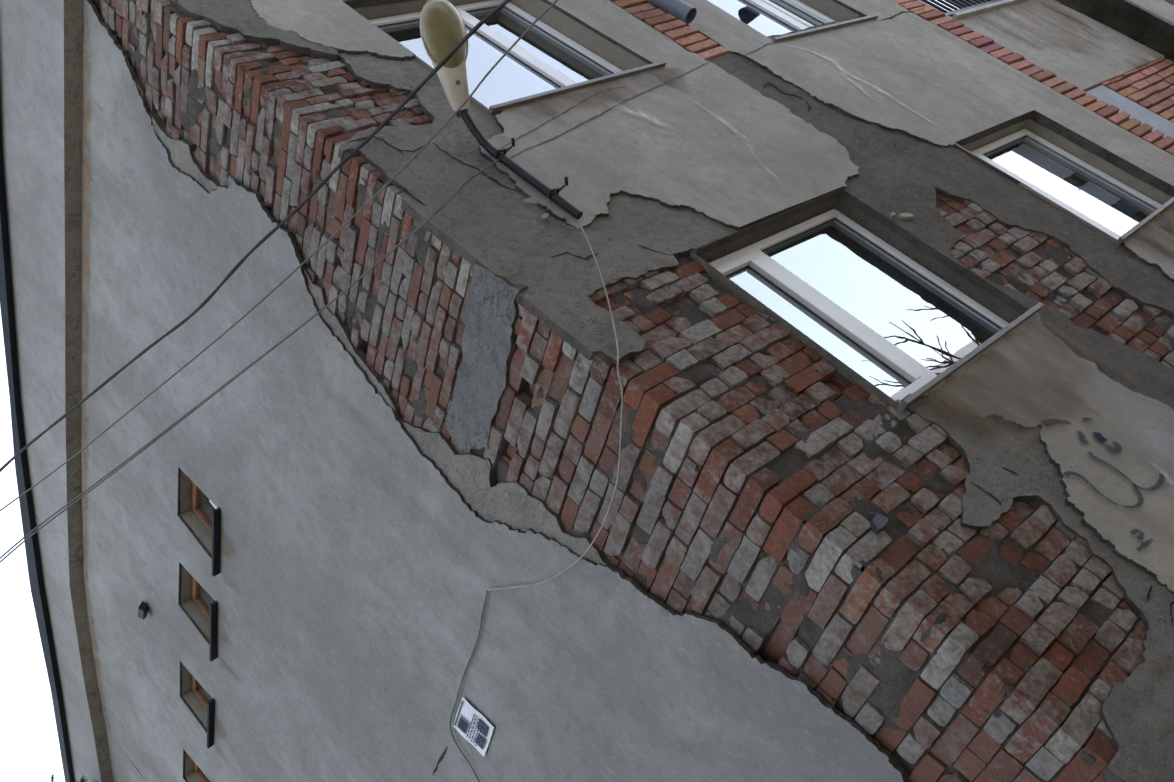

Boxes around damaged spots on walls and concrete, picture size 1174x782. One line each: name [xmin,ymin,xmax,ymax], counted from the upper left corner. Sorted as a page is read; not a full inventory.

flaking render [134,73,146,98]
flaking render [468,99,503,139]
flaking render [151,112,221,193]
flaking render [208,126,232,179]
flaking render [706,51,1174,410]
flaking render [347,280,378,333]
flaking render [514,303,621,422]
flaking render [320,307,592,556]
flaking render [483,330,621,541]
flaking render [583,543,618,570]
flaking render [617,520,651,564]
flaking render [854,701,886,738]